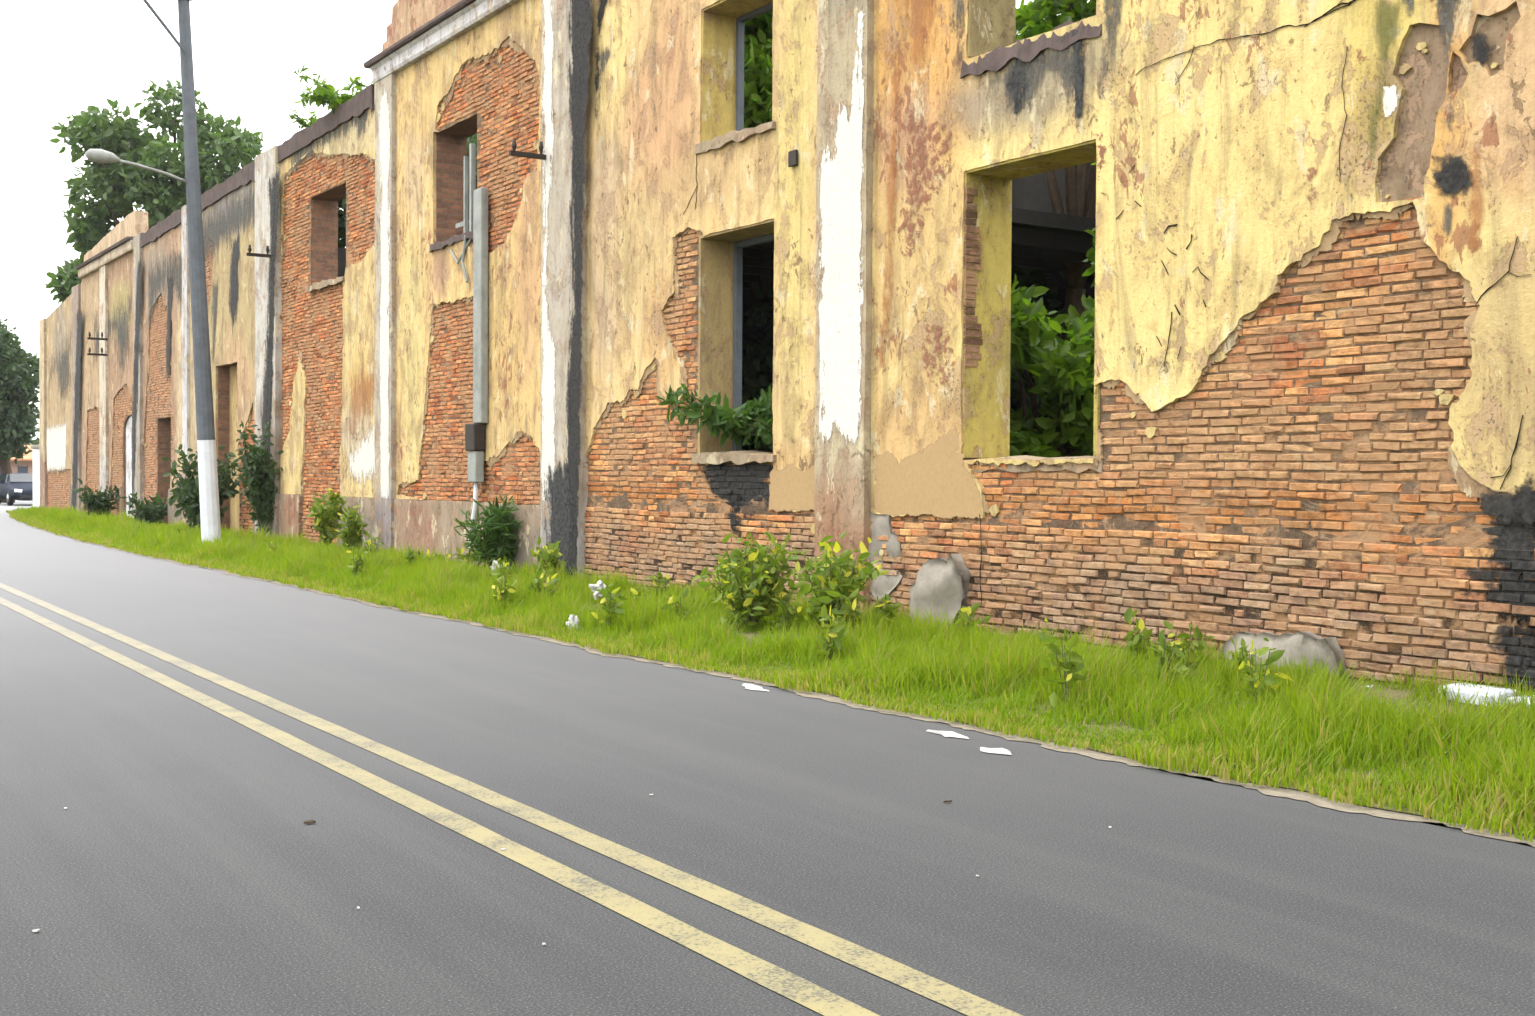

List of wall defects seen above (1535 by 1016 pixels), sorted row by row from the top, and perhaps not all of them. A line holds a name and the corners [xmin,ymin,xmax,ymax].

flaking render [48,294,175,515]
flaking render [281,0,556,546]
water stain [544,0,610,579]
flaking render [584,228,815,605]
water stain [702,462,773,534]
peeling [818,10,865,445]
flaking render [869,4,1535,690]
crack [1136,0,1356,85]
crack [1339,46,1348,181]
water stain [1371,85,1399,148]
water stain [1432,154,1473,235]
water stain [1461,475,1535,695]